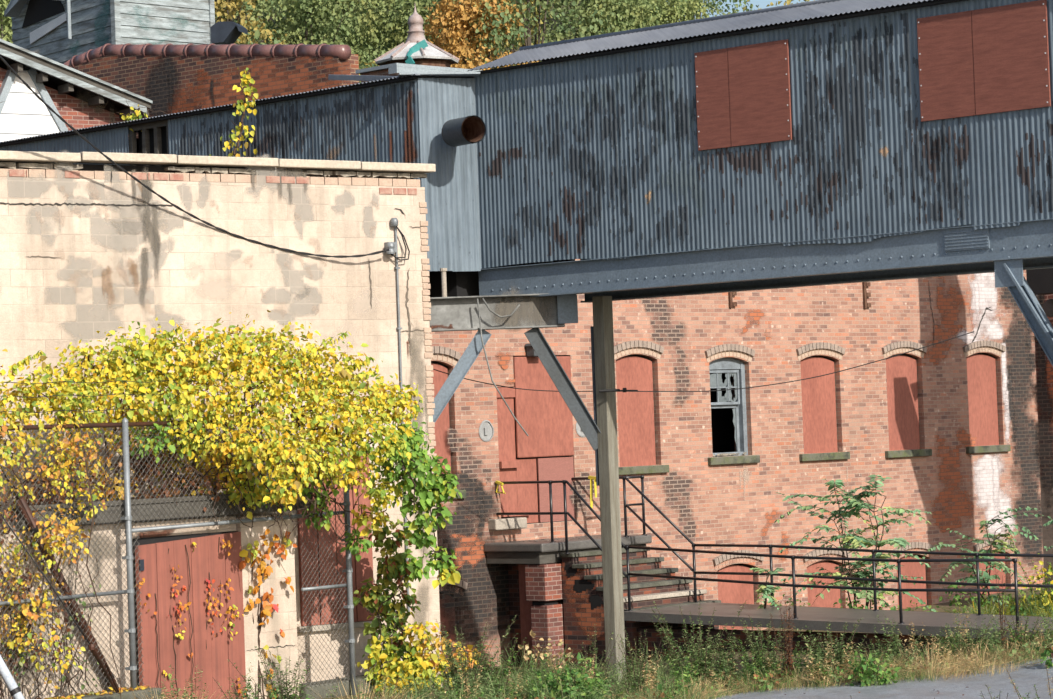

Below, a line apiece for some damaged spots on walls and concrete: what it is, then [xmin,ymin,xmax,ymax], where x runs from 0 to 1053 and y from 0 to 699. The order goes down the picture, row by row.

crack [0,169,172,208]
leakage [132,170,160,300]
spalling [167,56,417,236]
leakage [278,168,307,199]
rust [389,91,417,163]
peeling [479,13,1053,256]
leakage [957,272,1053,565]
leakage [475,488,485,536]
spalling [932,430,976,533]